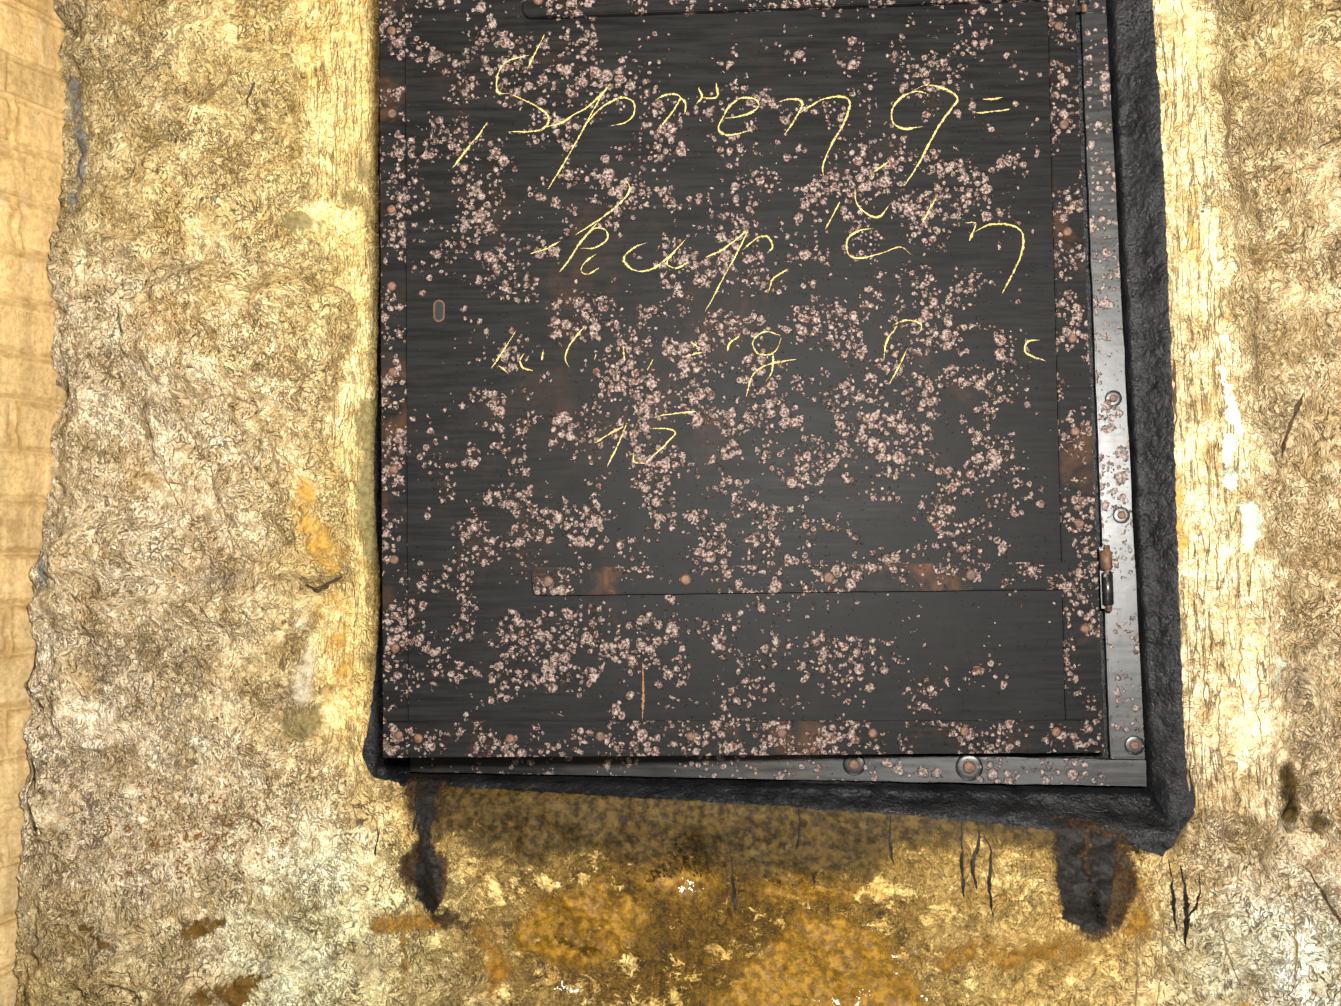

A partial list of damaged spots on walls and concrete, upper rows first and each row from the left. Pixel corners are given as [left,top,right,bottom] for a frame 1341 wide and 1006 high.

rust [370,907,442,990]
rust [481,938,511,995]
crack [1284,868,1341,999]